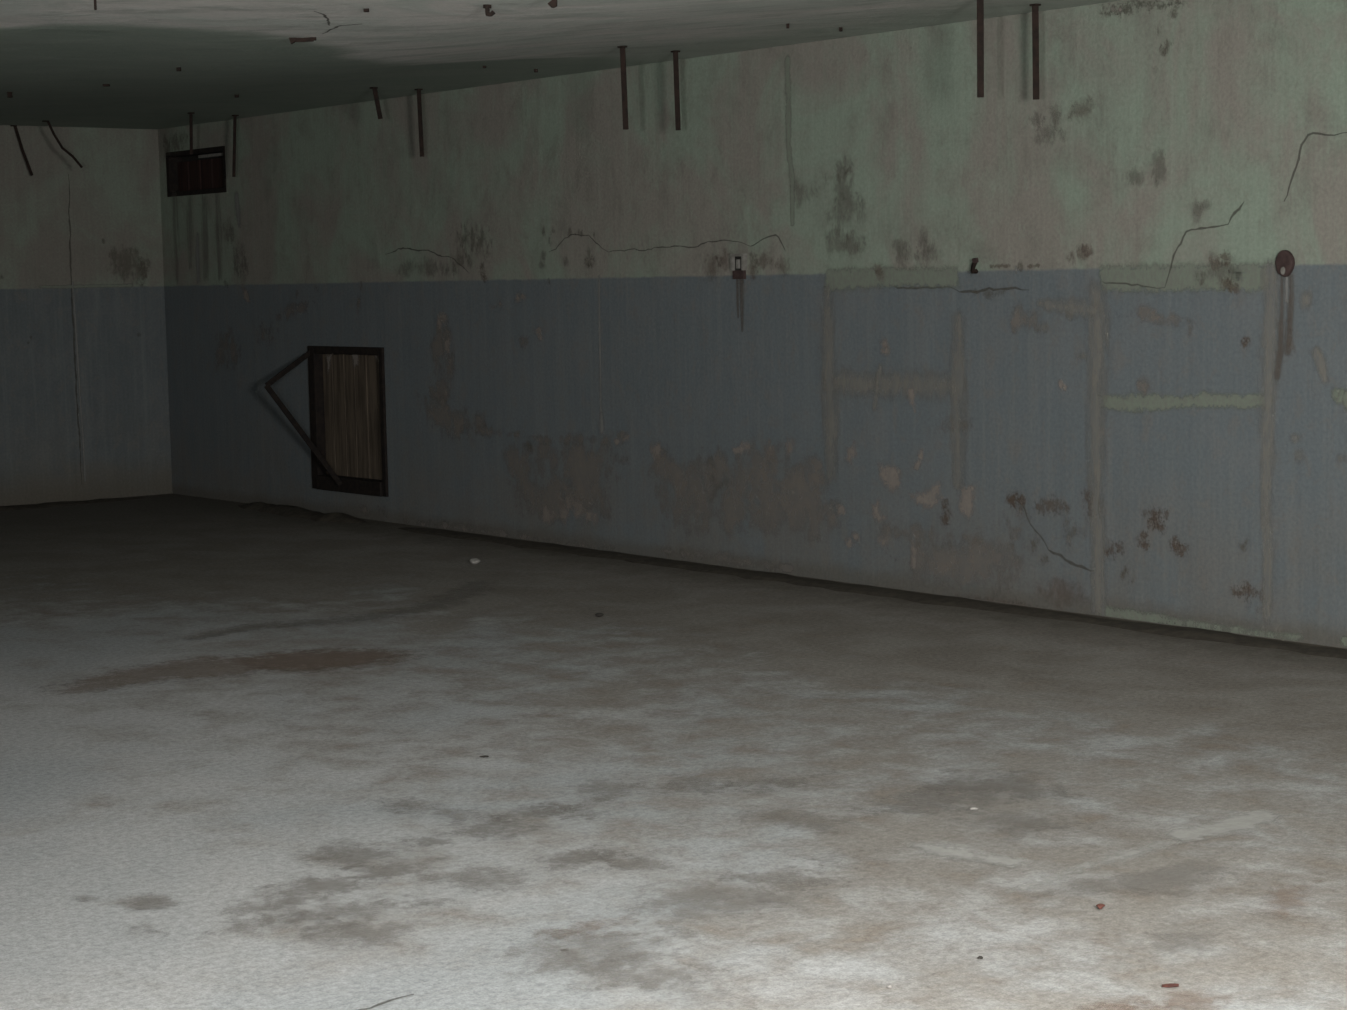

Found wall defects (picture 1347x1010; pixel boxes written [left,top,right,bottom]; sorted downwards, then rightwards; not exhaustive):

crack [1284,132,1347,201]
crack [549,234,785,252]
crack [1102,202,1244,289]
crack [1016,500,1094,572]
crack [358,994,414,1010]